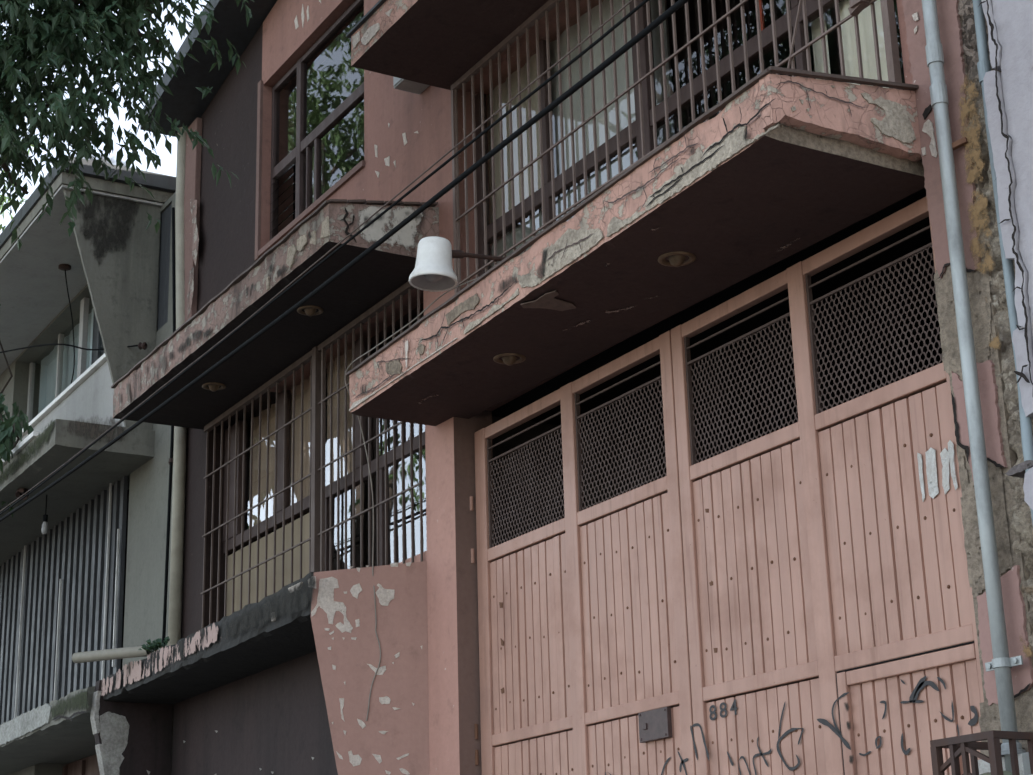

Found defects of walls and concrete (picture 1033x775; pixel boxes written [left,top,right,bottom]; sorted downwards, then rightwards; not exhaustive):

peeling [294,0,321,29]
peeling [352,9,393,48]
water stain [76,192,139,265]
peeling [187,199,199,319]
peeling [286,216,330,268]
peeling [349,124,780,411]
crack [545,80,868,267]
crack [978,0,1033,385]
peeling [288,565,368,650]
peeling [375,583,395,606]
peeling [90,623,218,775]
peeling [336,751,410,775]